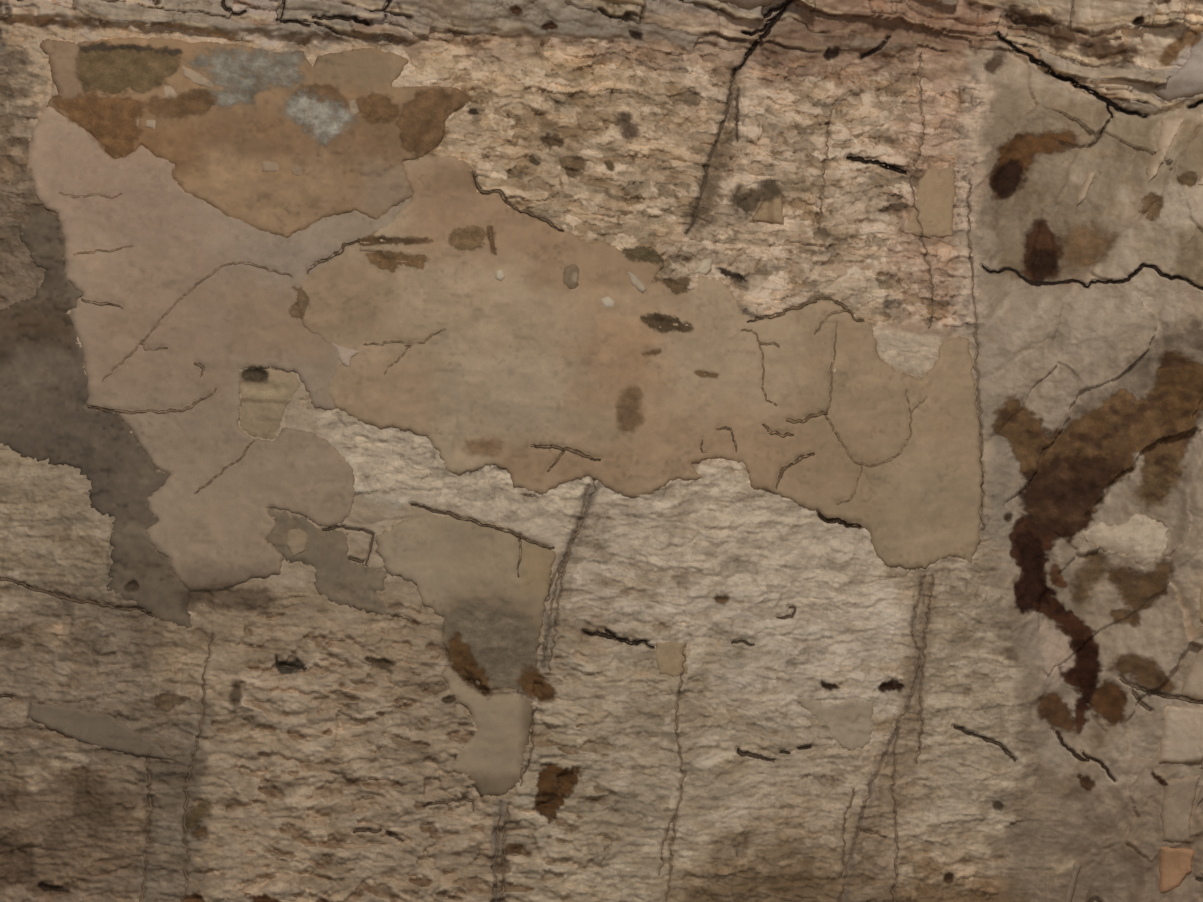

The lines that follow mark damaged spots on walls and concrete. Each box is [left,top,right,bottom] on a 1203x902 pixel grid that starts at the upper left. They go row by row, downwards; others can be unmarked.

peeling [163,86,178,99]
peeling [182,64,213,88]
crack [685,0,794,234]
crack [996,31,1148,148]
corrosion [990,130,1076,199]
corrosion [1022,220,1064,282]
crack [966,178,1203,530]
spalling [240,368,300,439]
peeling [286,528,308,557]
corrosion [1009,512,1127,733]
corrosion [448,633,489,695]
corrosion [518,667,555,702]